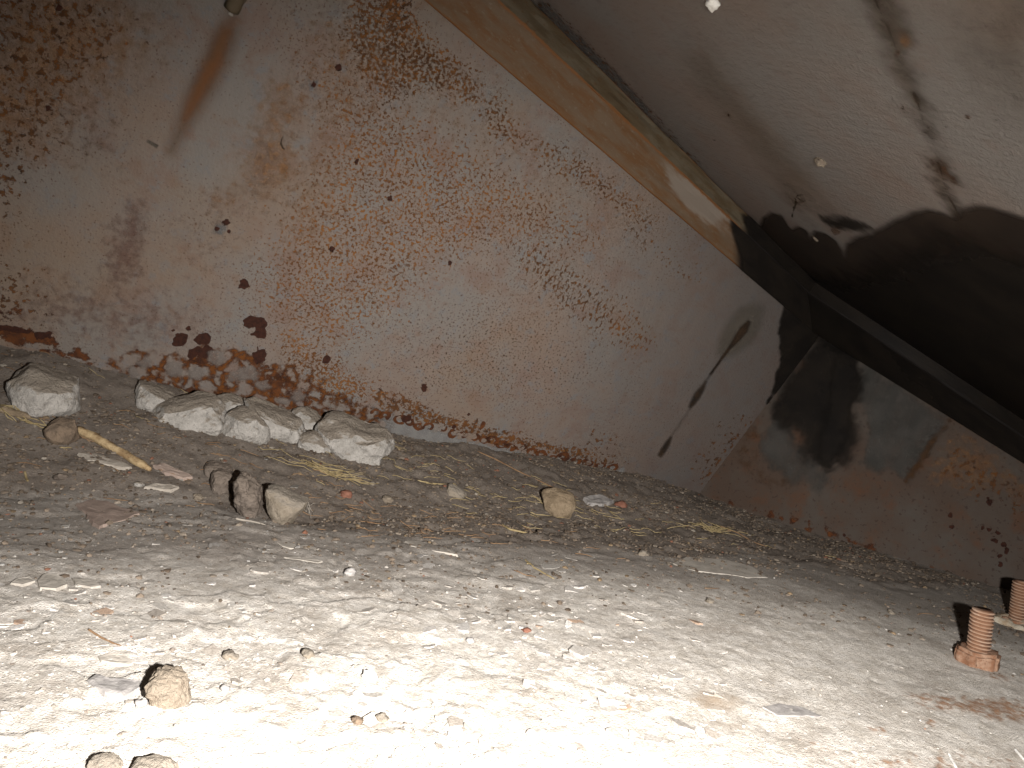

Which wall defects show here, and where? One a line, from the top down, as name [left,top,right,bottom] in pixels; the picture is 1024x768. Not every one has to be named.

corrosion [0,0,136,217]
corrosion [236,0,707,470]
corrosion [171,326,213,367]
leakage [689,310,759,407]
leakage [731,207,1024,486]